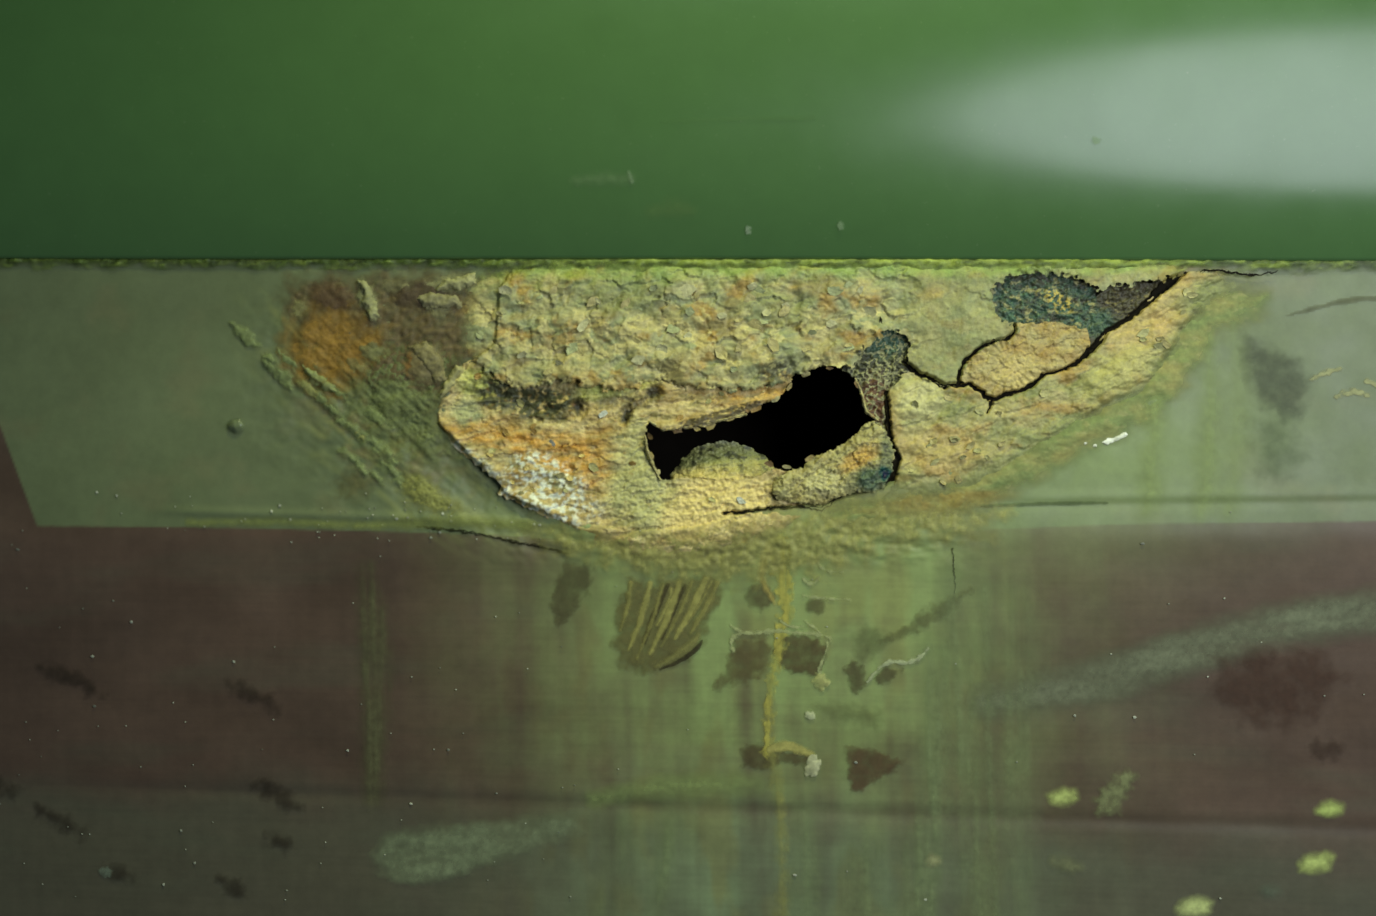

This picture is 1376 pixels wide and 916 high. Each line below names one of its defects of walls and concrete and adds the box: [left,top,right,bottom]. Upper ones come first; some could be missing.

corrosion [291,314,380,384]
peeling [464,262,1242,497]
crack [885,269,1278,483]